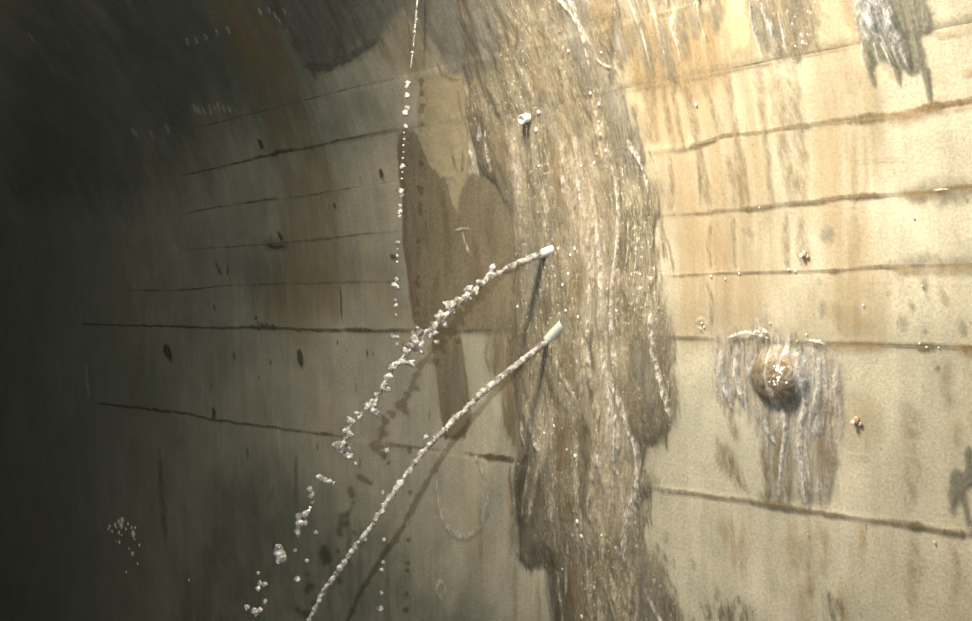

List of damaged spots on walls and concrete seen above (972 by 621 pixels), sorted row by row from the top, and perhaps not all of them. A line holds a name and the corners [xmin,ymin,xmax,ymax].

damp [611,0,718,78]
damp [748,0,817,61]
damp [856,0,931,102]
damp [397,130,520,452]
damp [948,447,972,524]